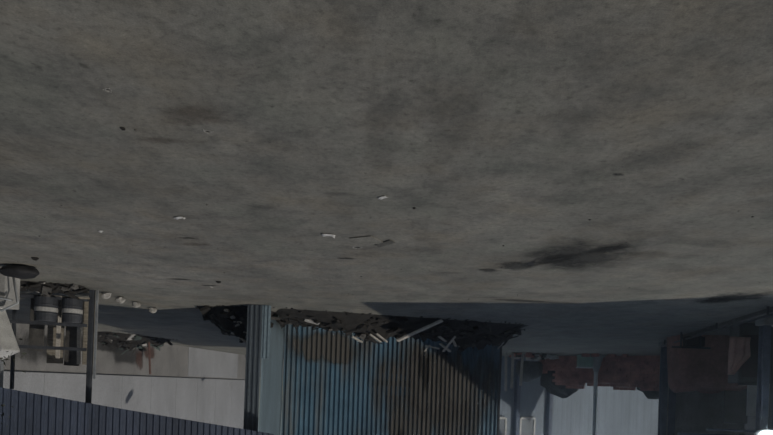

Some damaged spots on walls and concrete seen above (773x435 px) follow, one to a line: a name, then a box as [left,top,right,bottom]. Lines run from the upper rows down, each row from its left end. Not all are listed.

damp [532,243,624,268]
damp [699,293,762,303]